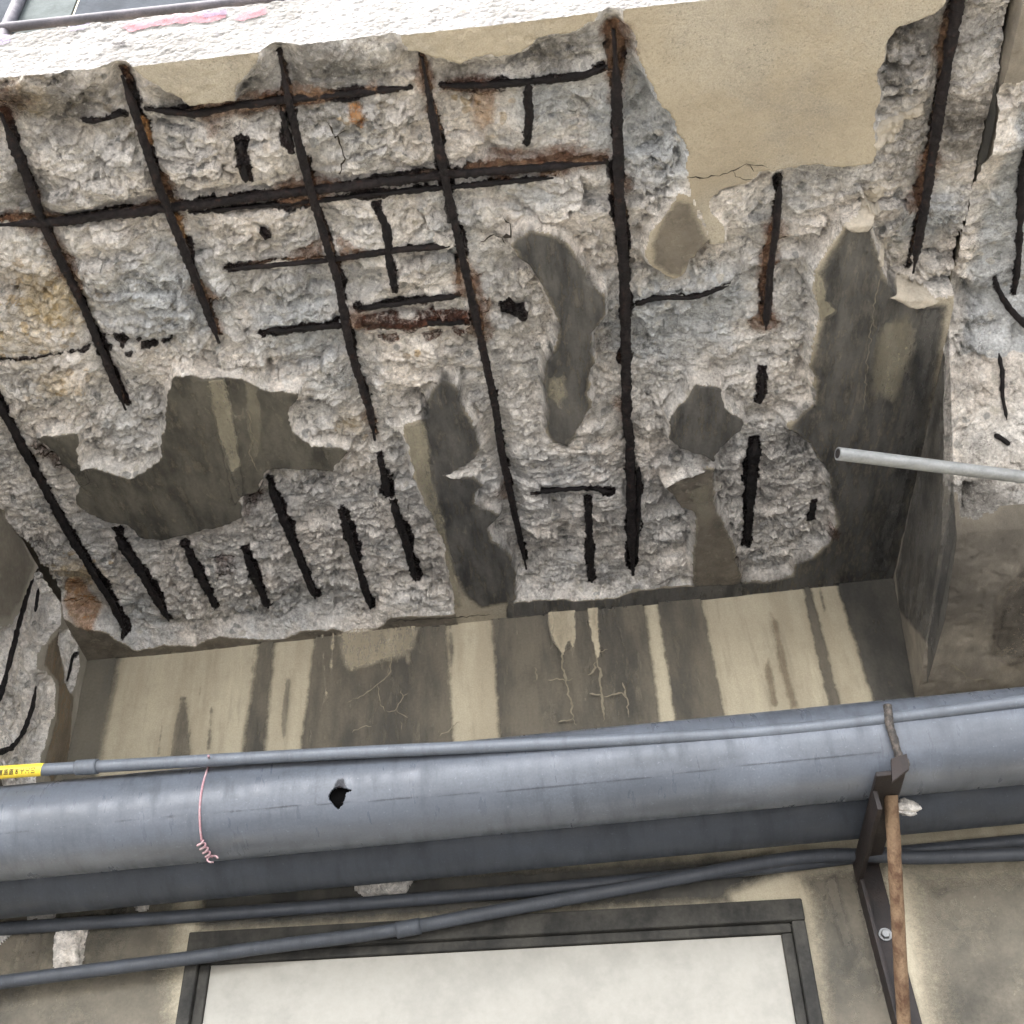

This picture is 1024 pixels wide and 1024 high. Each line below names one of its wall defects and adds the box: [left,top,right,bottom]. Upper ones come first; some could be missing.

rust [0,18,731,435]
crack [689,164,766,180]
rust [750,172,785,331]
rust [903,0,951,268]
spalling [0,0,1024,786]
rust [0,392,132,641]
rust [179,538,272,610]
rust [337,505,376,608]
rust [376,450,423,581]
water stain [38,229,957,781]
rust [530,484,616,582]
crack [535,649,629,725]